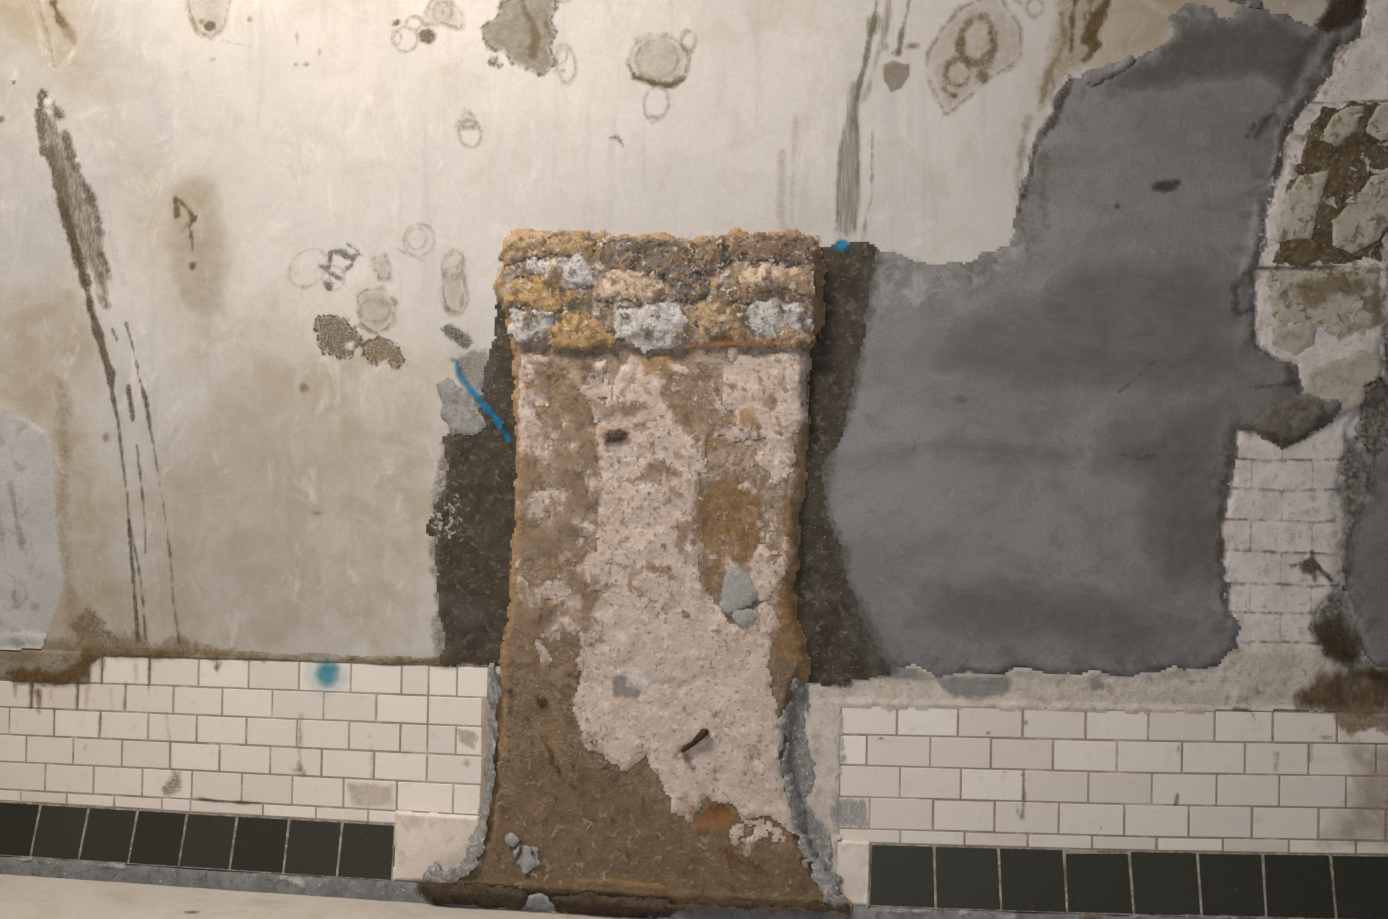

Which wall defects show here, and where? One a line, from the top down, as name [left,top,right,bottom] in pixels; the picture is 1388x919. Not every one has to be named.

water stain [1136,0,1366,103]
water stain [35,90,118,315]
water stain [174,196,197,269]
water stain [1154,180,1179,191]
peeling [0,408,65,650]
peeling [429,471,462,539]
spalling [443,325,494,389]
peeling [515,353,614,671]
peeling [697,418,797,601]
water stain [793,0,1004,686]
peeling [804,0,1388,874]
peeling [729,819,786,857]